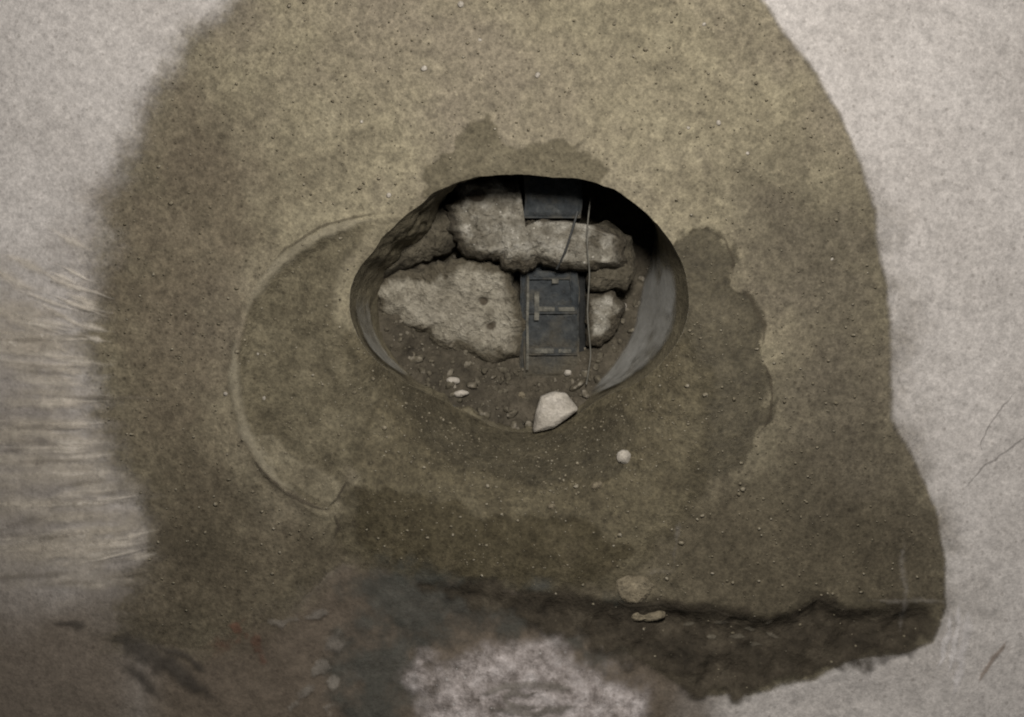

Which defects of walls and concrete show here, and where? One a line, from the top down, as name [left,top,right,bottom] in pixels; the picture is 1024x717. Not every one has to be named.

hole [349,176,532,432]
water stain [72,0,945,650]
efflorescence [0,422,139,560]
water stain [331,639,644,717]
water stain [750,665,835,694]